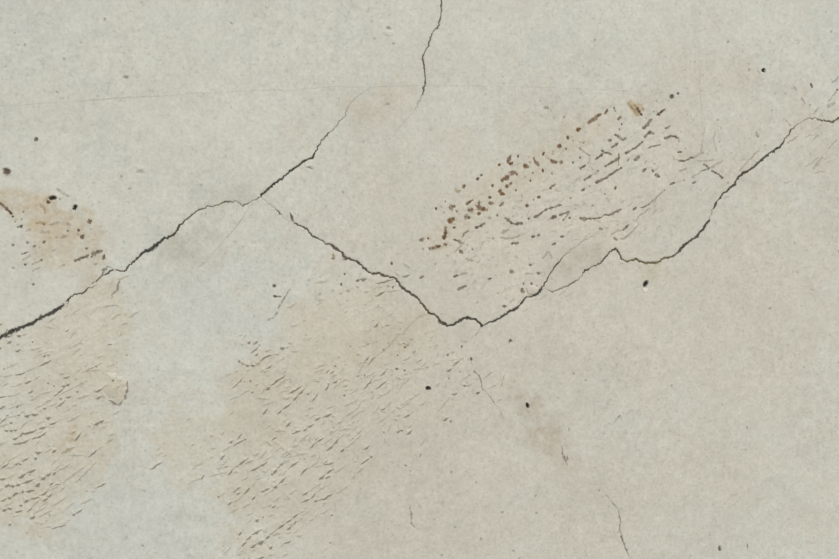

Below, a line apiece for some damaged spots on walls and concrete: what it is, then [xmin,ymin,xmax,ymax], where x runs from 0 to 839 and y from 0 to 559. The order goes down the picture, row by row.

crack [392,0,443,138]
crack [0,87,839,366]
corrosion [418,96,645,259]
peeling [410,85,729,318]
peeling [0,267,142,548]
crack [473,370,504,419]